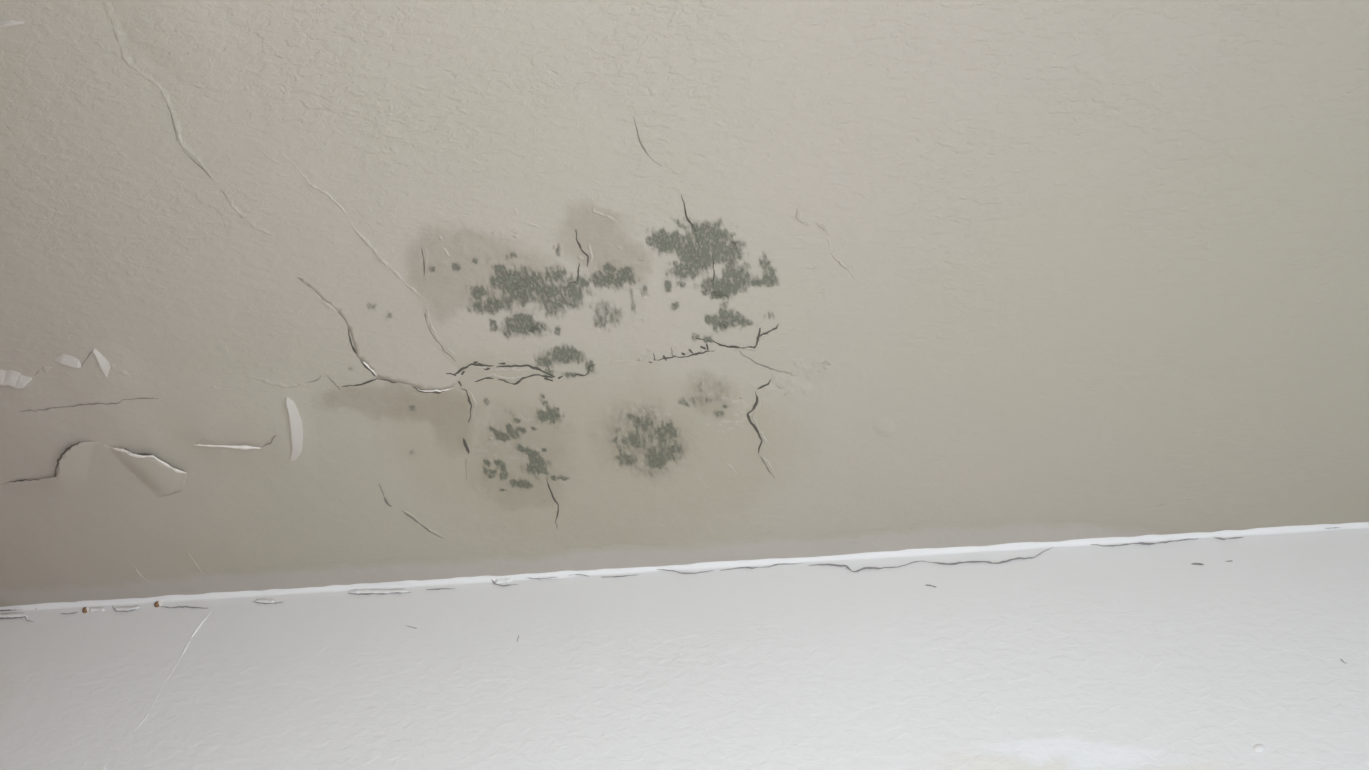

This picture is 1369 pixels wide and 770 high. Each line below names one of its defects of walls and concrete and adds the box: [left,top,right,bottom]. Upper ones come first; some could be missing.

crack [101,0,274,237]
crack [633,117,661,166]
leakage [649,221,777,343]
crack [263,152,842,481]
leakage [364,254,828,558]
crack [379,485,444,539]
crack [546,477,559,529]
crack [255,597,282,605]
crack [349,587,454,595]
crack [492,547,1053,587]
crack [1091,537,1243,547]